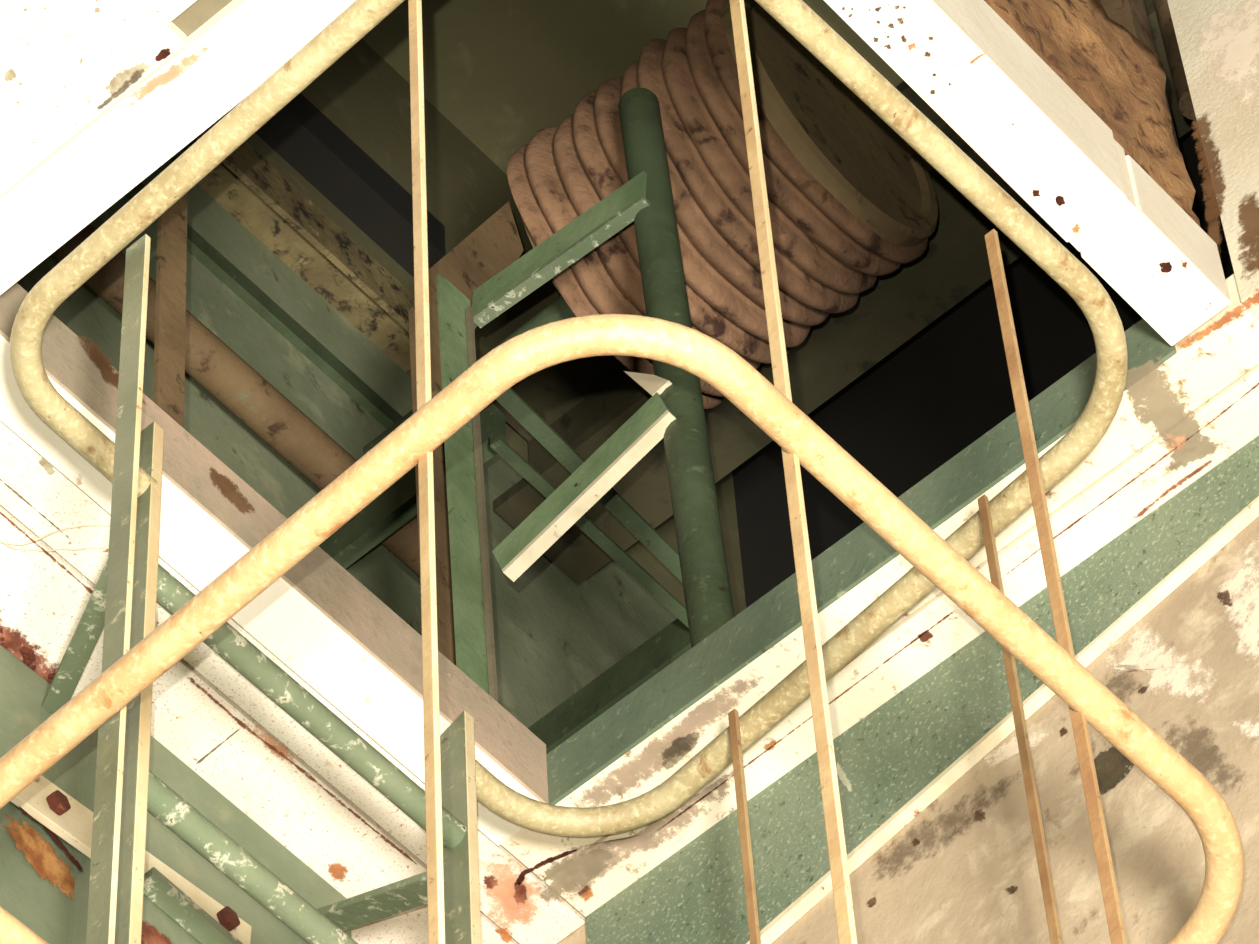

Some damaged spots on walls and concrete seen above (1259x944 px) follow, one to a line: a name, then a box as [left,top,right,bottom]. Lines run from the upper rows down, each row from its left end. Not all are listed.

water stain [1125,357,1222,471]
rust [4,807,83,899]
rust [141,921,172,944]
rust [483,847,581,942]
rust [580,885,593,901]